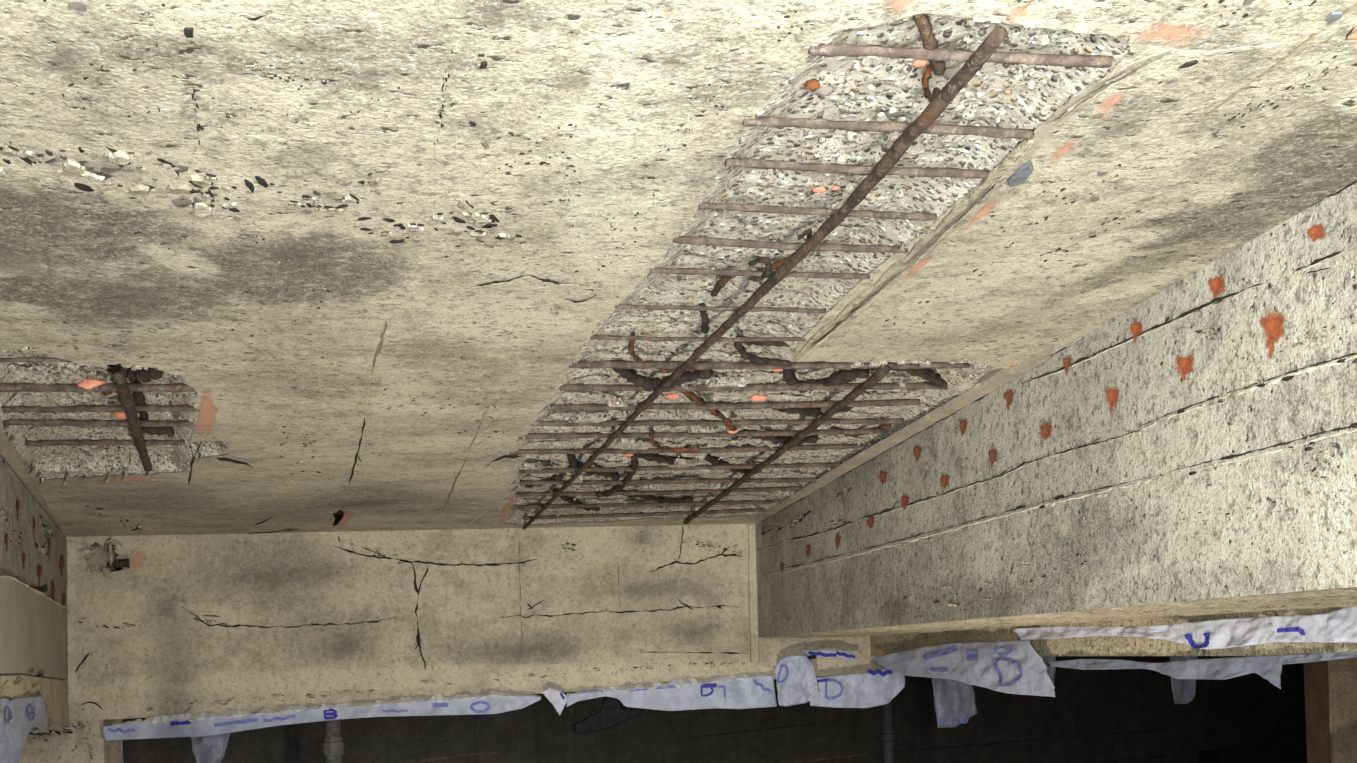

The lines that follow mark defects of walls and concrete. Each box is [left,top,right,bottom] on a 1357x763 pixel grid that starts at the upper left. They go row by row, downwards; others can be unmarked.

spalling [0,347,230,487]
spalling [458,0,1141,557]
rust [1105,387,1119,413]
crack [978,283,1264,385]
rust [1176,357,1194,382]
rust [1208,277,1225,298]
rust [1261,312,1284,357]
rust [1307,224,1325,242]
crack [1295,250,1344,274]
crack [493,418,1167,618]
peeling [0,574,136,701]
crack [187,536,537,671]